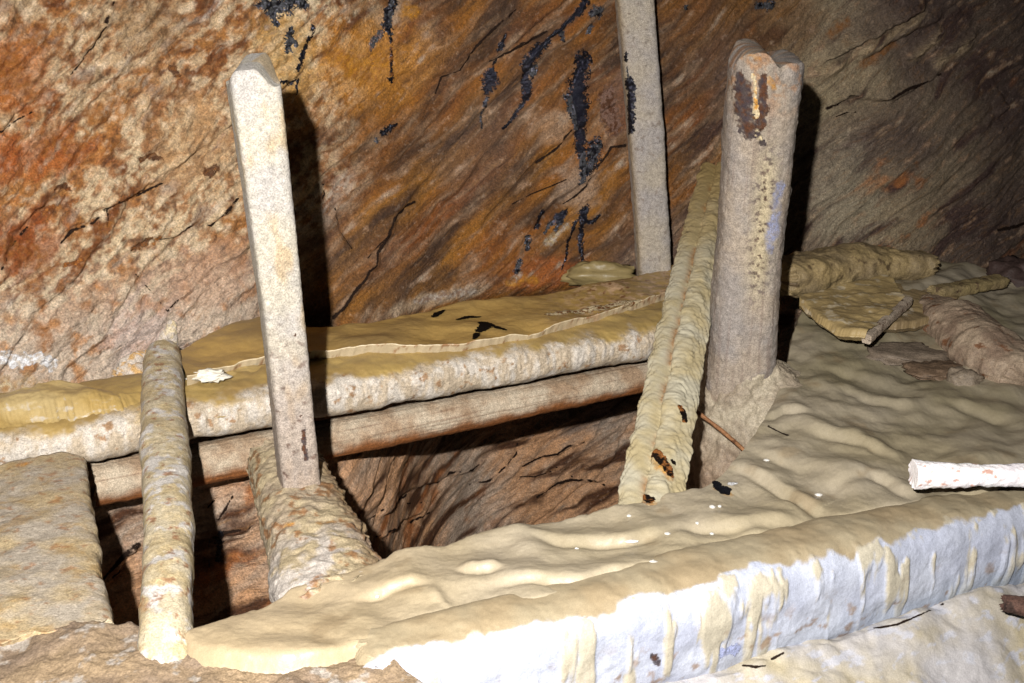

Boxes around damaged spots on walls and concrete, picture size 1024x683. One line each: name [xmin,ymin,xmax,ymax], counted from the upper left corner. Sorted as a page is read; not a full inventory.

damp [337,0,419,84]
damp [479,33,507,129]
damp [502,0,604,130]
damp [562,49,603,186]
damp [624,51,637,135]
crack [60,183,163,244]
crack [322,184,416,319]
damp [509,203,601,285]
crack [369,441,605,538]